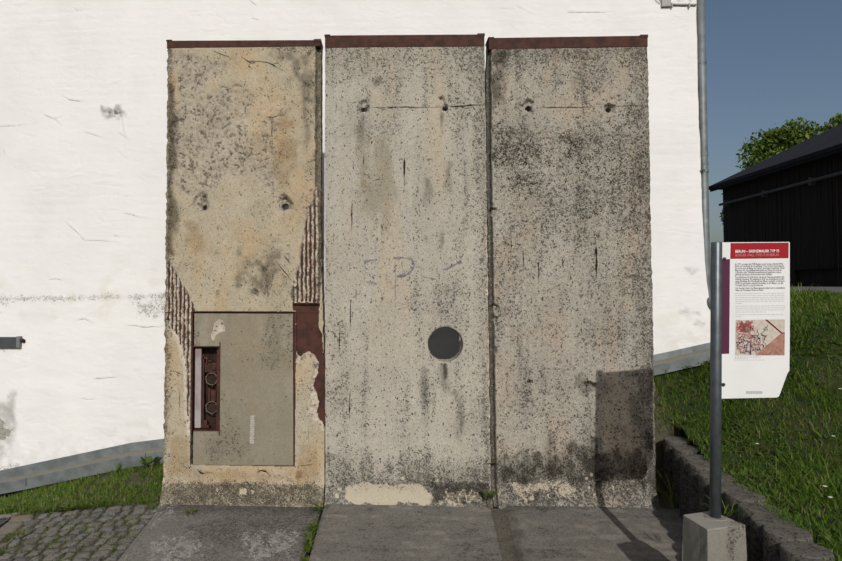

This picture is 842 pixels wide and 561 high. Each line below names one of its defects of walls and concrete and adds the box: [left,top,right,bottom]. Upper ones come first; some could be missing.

spalling [170,51,295,213]
spalling [358,98,371,113]
spalling [518,97,536,113]
spalling [284,184,322,305]
spalling [164,257,196,433]
spalling [296,351,325,431]